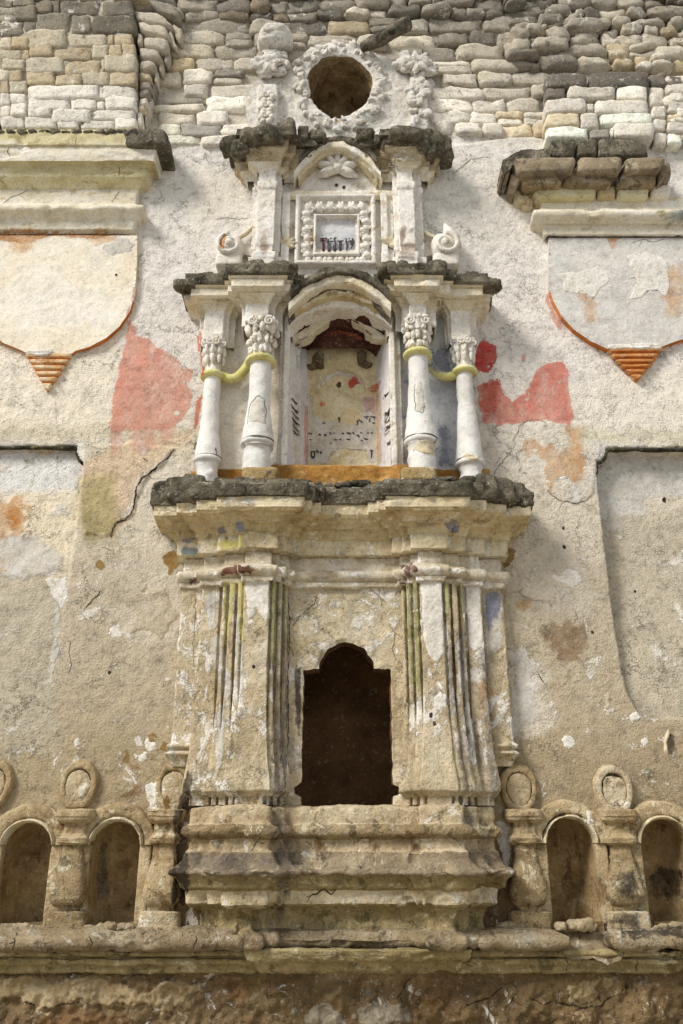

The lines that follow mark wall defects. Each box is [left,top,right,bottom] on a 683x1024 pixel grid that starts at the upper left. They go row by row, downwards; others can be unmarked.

flaking render [546,266,612,329]
flaking render [627,253,670,303]
crack [110,444,218,537]
peeling [213,522,245,553]
flaking render [204,580,288,773]
spalling [134,738,156,762]
spalling [145,782,162,810]
damp [649,867,682,895]
crack [465,958,638,1022]